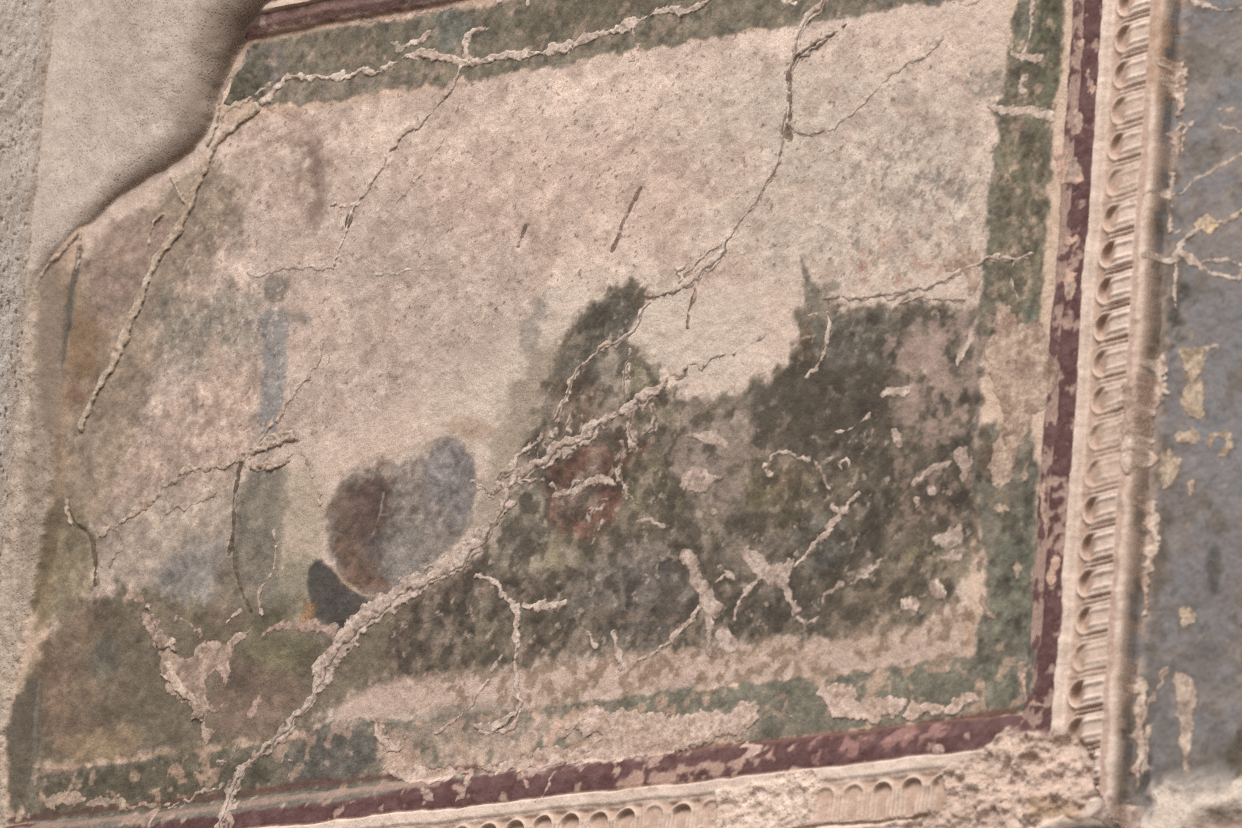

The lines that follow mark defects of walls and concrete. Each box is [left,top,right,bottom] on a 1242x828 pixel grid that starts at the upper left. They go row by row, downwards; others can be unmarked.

crack [987,0,1055,122]
peeling [1051,148,1084,185]
peeling [1156,57,1188,235]
crack [40,232,83,278]
crack [804,252,1033,379]
peeling [1063,266,1077,301]
crack [64,0,944,828]
peeling [1118,346,1233,617]
peeling [370,700,763,803]
peeling [816,682,979,725]
spalling [867,725,1145,828]
peeling [1124,667,1198,787]